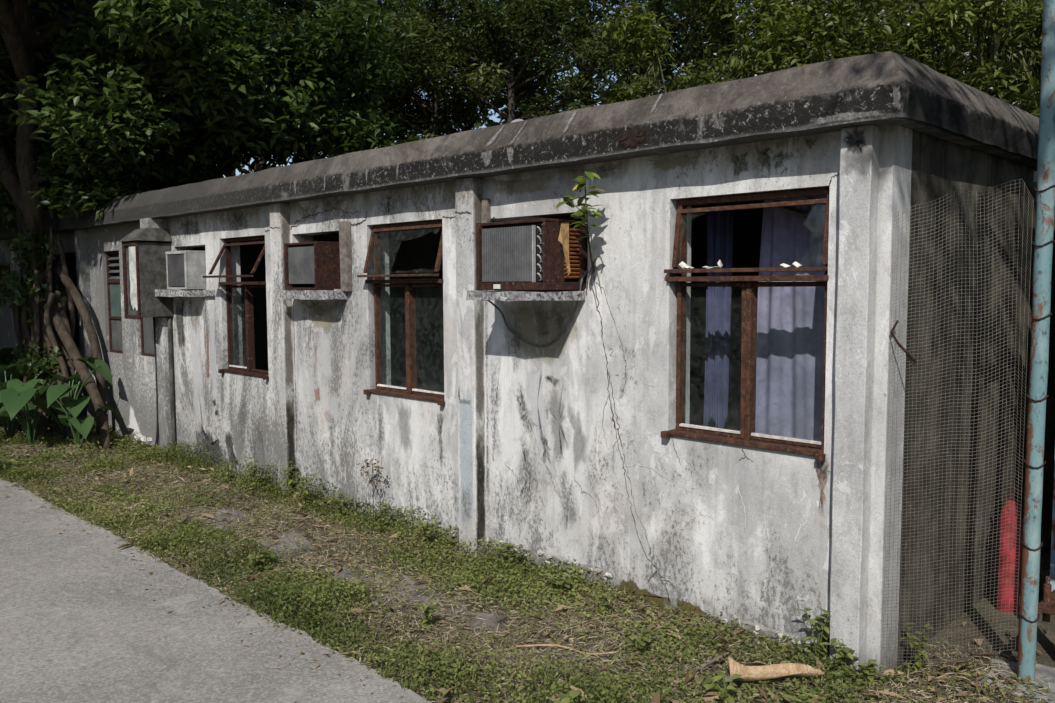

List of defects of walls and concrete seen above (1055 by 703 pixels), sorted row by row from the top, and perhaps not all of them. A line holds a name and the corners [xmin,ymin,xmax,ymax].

leakage [541,377,584,462]
crack [593,262,679,601]
corrosion [816,461,829,502]